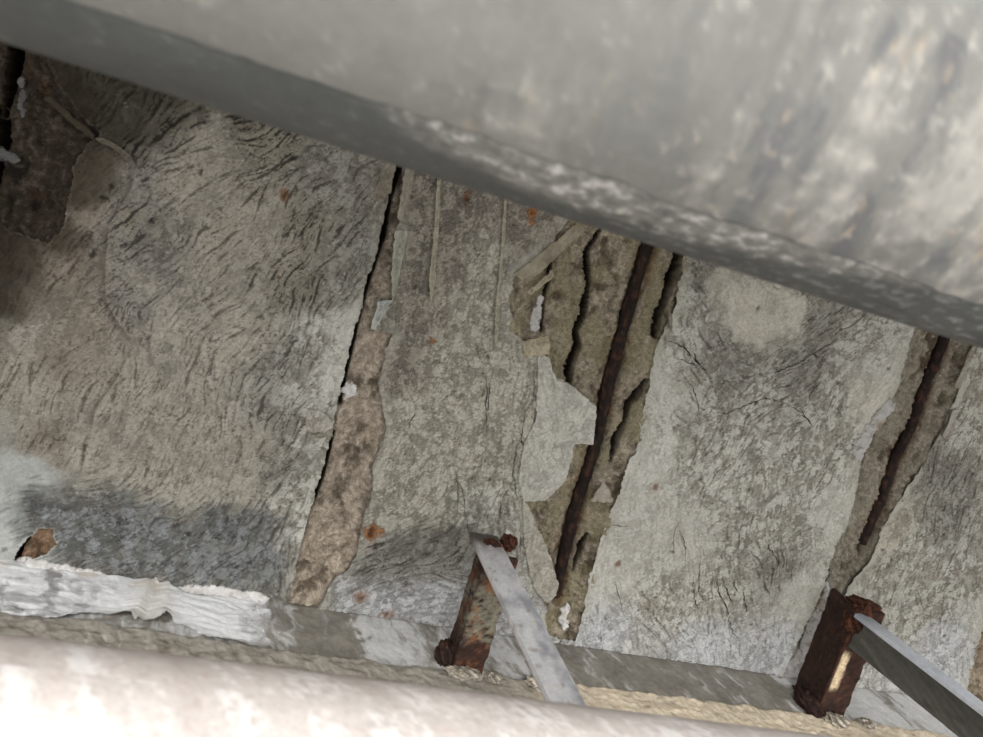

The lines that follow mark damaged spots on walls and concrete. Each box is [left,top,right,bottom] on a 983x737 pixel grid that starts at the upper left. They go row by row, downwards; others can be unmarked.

spalling [0,42,135,243]
spalling [287,162,415,607]
spalling [494,199,689,641]
crack [650,252,835,425]
spalling [808,328,976,622]
spalling [967,631,983,702]